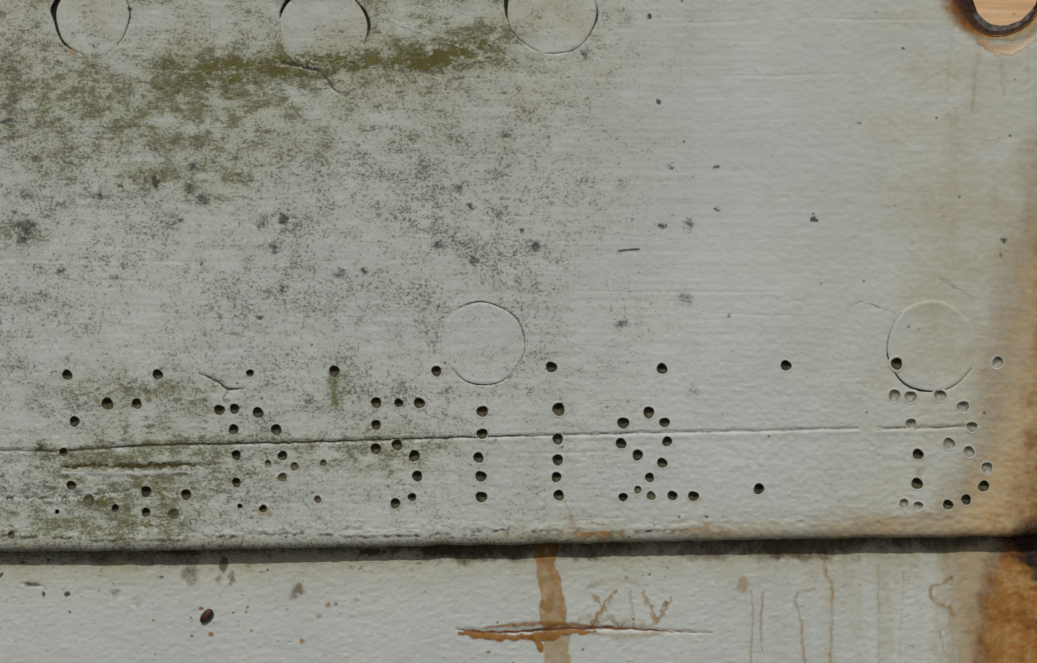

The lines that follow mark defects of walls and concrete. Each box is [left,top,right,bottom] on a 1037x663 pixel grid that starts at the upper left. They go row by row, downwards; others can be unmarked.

rust [946,0,1037,56]
rust [830,192,1037,663]
rust [575,529,623,539]
water stain [412,544,533,564]
water stain [561,542,632,559]
rust [534,532,570,663]
crack [458,622,682,653]